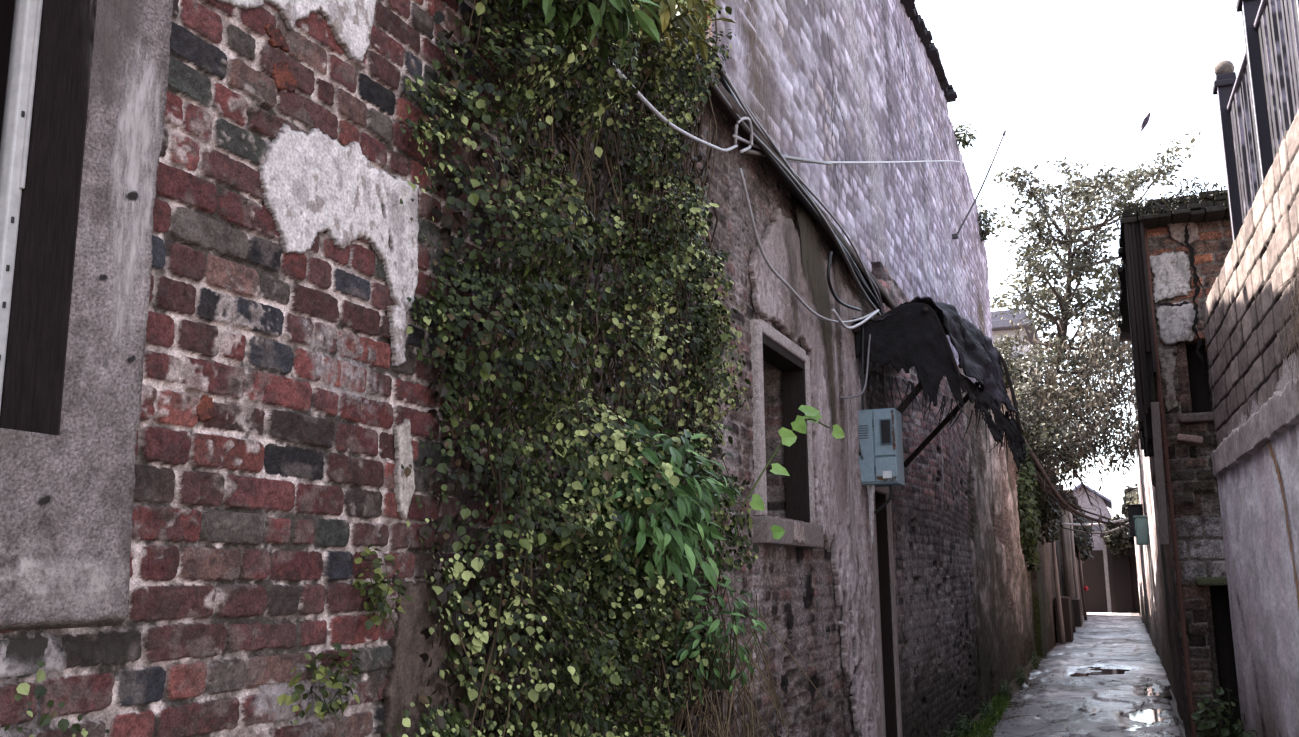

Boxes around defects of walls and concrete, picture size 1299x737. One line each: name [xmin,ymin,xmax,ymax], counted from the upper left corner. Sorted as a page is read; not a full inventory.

flaking render [217,0,376,93]
flaking render [258,123,420,366]